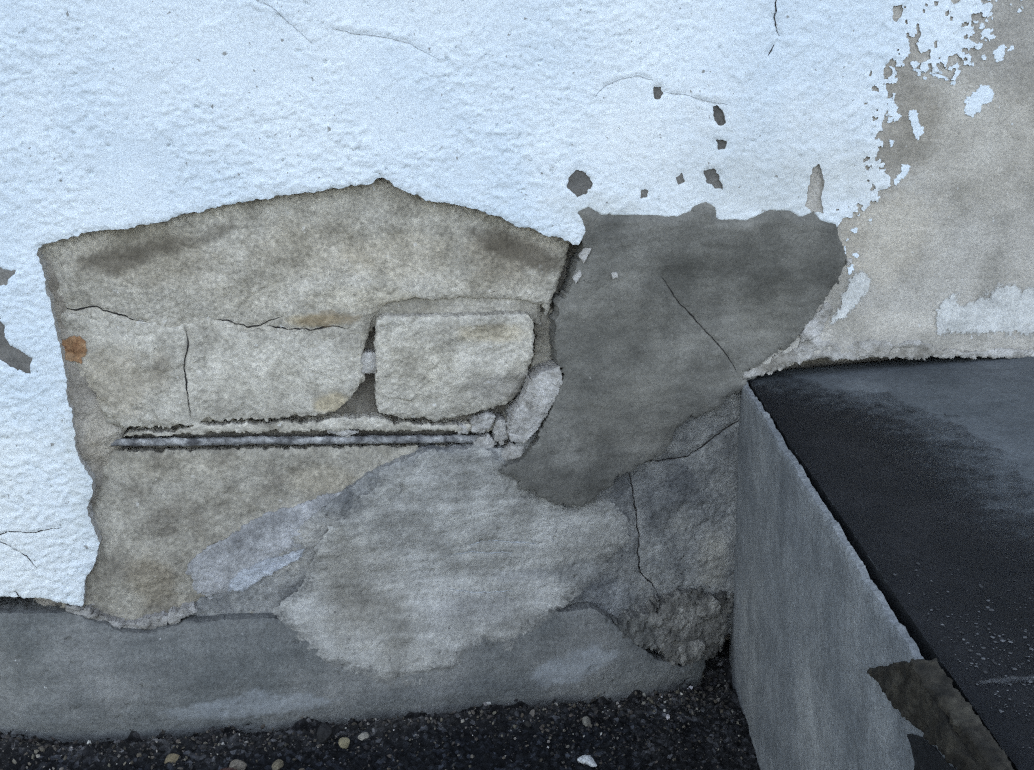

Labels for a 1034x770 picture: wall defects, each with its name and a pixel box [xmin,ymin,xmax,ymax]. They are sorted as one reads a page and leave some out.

crack [332,28,438,59]
peeling [567,170,592,197]
peeling [805,164,823,213]
flaking render [809,0,1034,360]
peeling [0,267,16,286]
peeling [0,318,38,373]
rust [62,336,87,364]
crack [664,280,736,370]
flaking render [763,329,803,370]
spalling [33,178,576,630]
crack [629,420,739,597]
spalling [609,586,734,672]